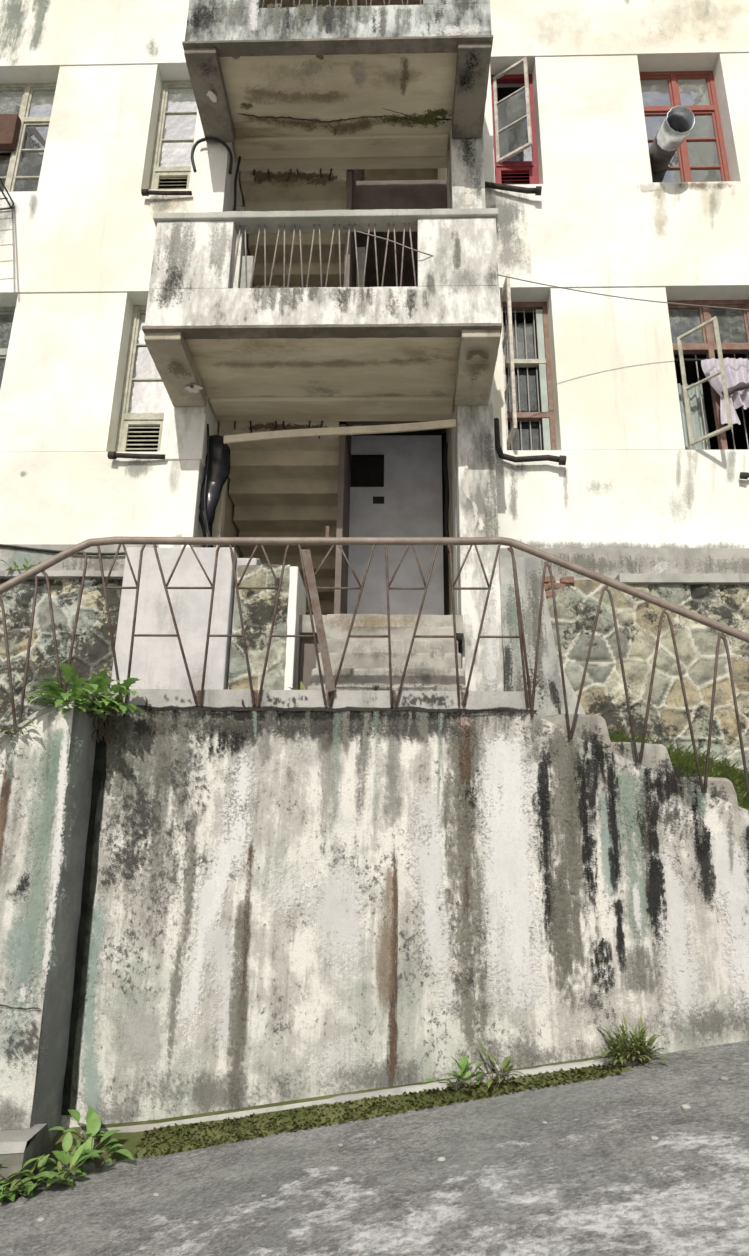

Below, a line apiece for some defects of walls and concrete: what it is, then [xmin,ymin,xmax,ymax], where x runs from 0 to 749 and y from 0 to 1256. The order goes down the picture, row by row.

leakage [0,0,50,63]
leakage [187,0,487,37]
crack [238,108,451,136]
spalling [250,168,341,187]
leakage [153,263,191,307]
leakage [261,286,318,314]
leakage [406,289,417,318]
rust [383,690,402,825]
rust [0,761,12,855]
leakage [85,541,749,1124]
rust [376,848,399,1087]
crack [0,1003,40,1011]